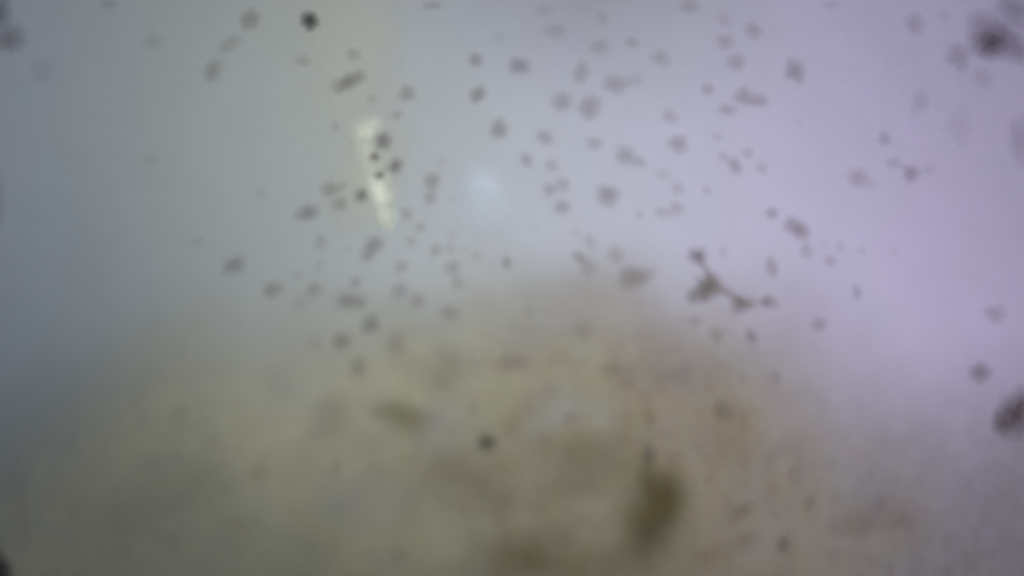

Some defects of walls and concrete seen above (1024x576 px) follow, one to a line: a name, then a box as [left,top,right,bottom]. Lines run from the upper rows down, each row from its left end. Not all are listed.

leakage [369,173,391,220]
leakage [0,334,1024,576]